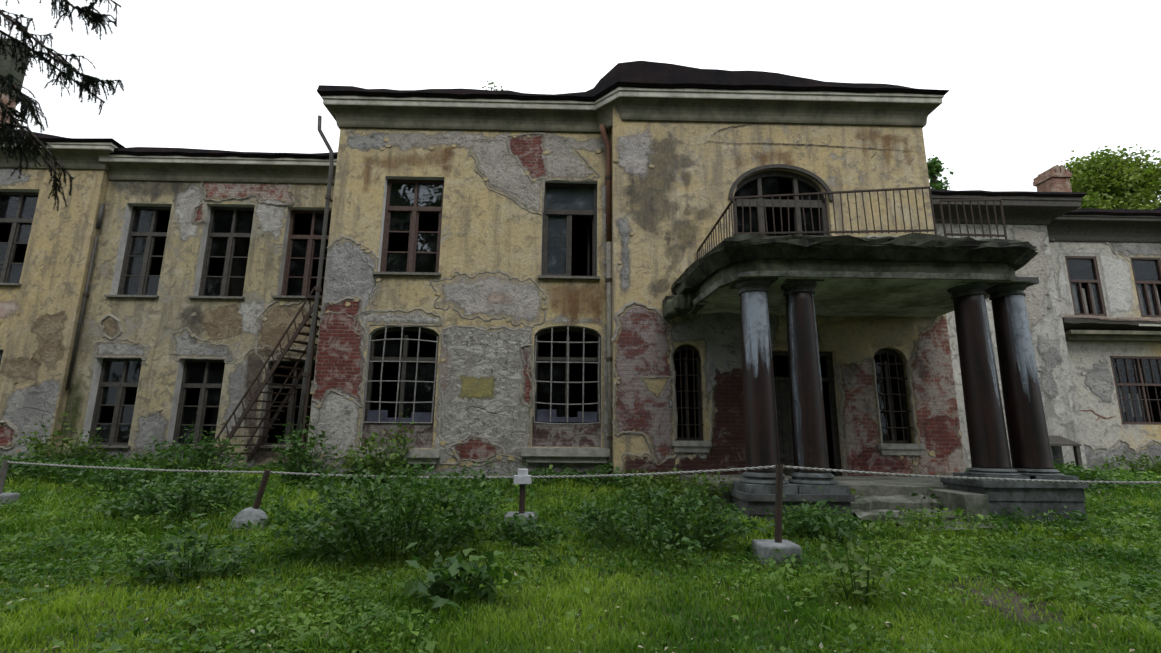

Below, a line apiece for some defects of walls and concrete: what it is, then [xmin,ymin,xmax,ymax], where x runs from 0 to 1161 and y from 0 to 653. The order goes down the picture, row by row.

water stain [627,139,705,251]
peeling [0,312,66,460]
peeling [68,128,771,483]
peeling [789,294,799,433]
spalling [836,314,966,477]